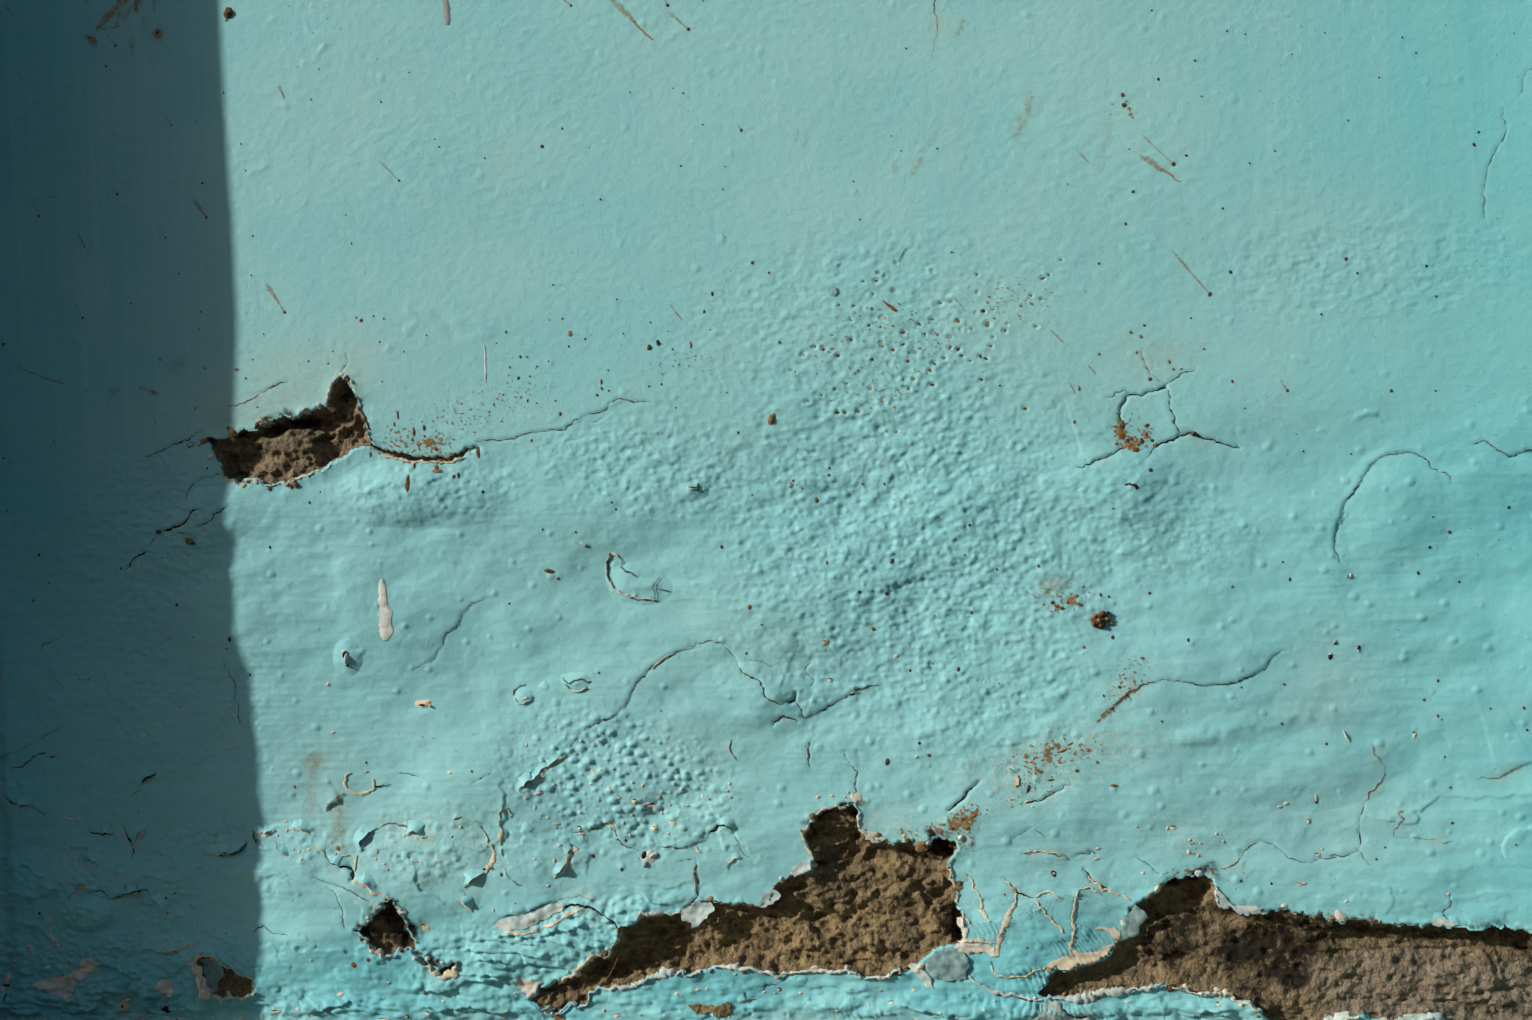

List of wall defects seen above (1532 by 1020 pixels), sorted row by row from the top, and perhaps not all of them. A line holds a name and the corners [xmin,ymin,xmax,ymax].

corrosion [87,0,139,44]
spalling [200,372,373,489]
crack [370,398,650,464]
crack [1080,354,1239,487]
crack [1474,440,1532,457]
crack [1333,452,1451,562]
crack [202,640,879,929]
spalling [355,897,458,980]
spalling [492,791,1532,1020]
peeling [141,979,180,1020]
spalling [186,950,257,1019]